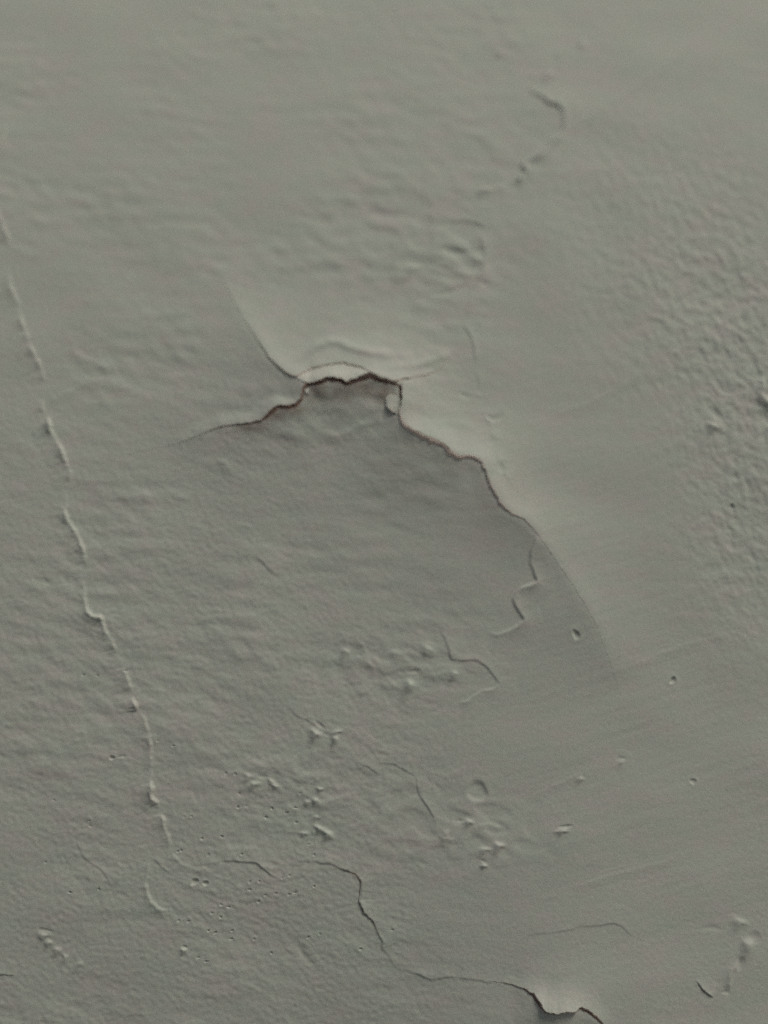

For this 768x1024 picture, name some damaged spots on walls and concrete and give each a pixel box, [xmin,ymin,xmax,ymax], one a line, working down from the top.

peeling [128,261,624,696]
peeling [391,662,467,704]
peeling [228,756,285,802]
peeling [287,777,350,852]
peeling [487,972,617,1024]